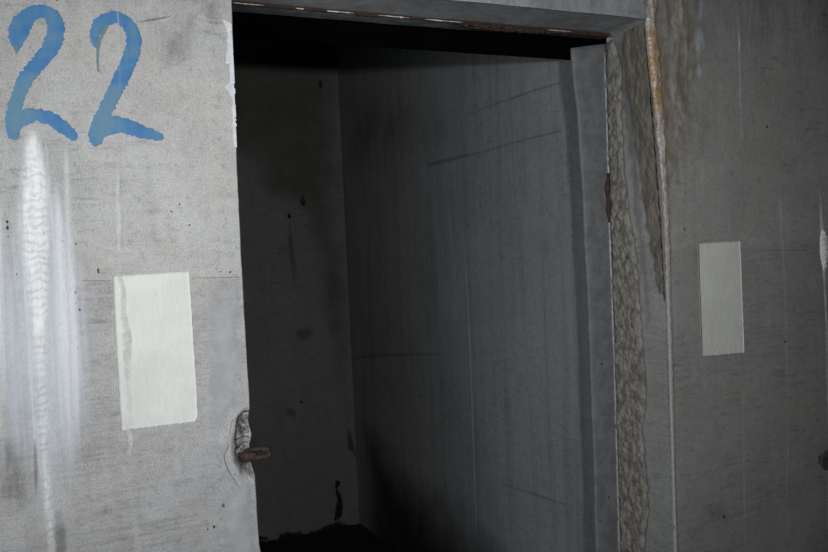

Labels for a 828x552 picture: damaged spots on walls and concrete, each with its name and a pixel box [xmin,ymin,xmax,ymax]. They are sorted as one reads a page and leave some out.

leakage [0,133,79,505]
flaking render [606,22,665,552]
leakage [820,196,828,386]